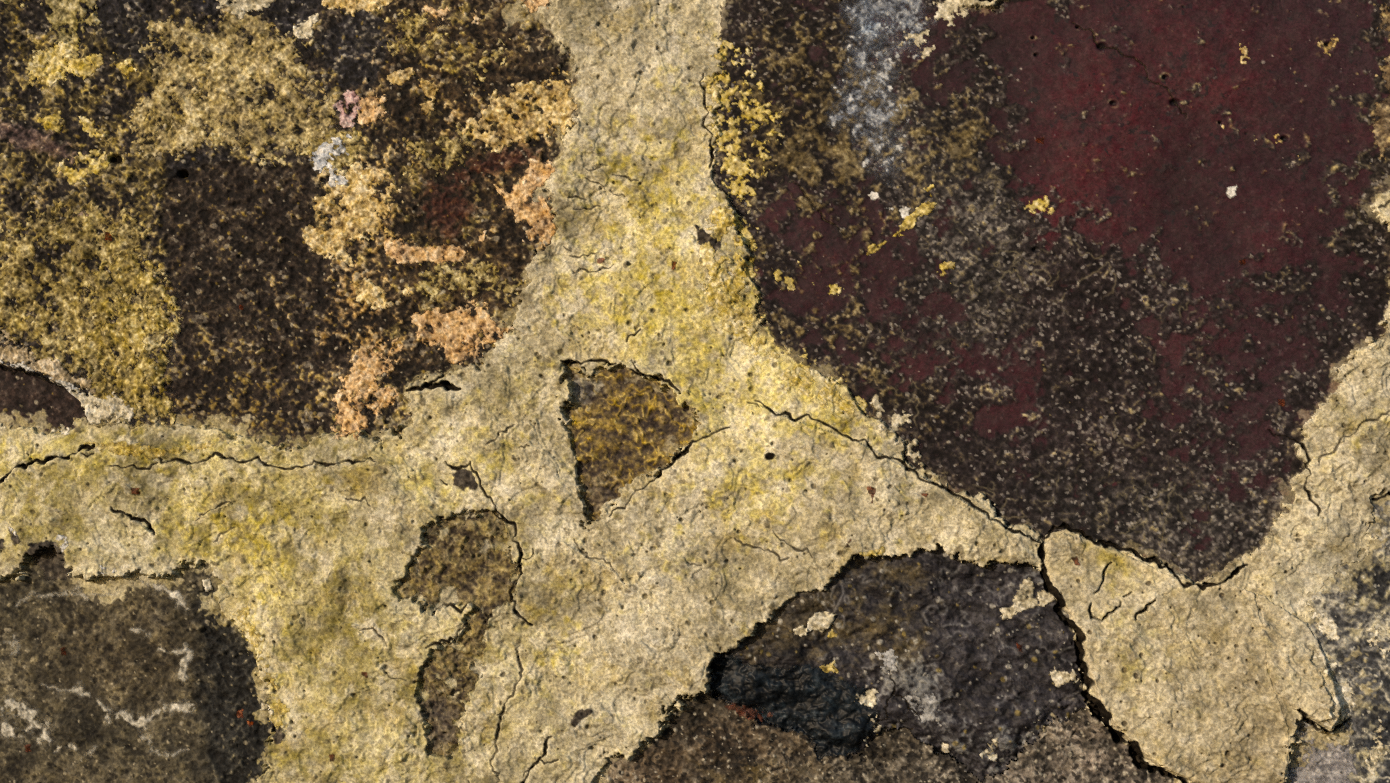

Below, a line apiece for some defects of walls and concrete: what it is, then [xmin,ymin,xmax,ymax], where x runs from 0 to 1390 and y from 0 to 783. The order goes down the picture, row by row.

peeling [300,67,487,310]
peeling [462,70,577,248]
peeling [0,328,96,395]
peeling [330,300,515,440]
crack [0,444,375,483]
spalling [0,529,73,581]
spalling [397,509,520,757]
peeling [793,611,836,637]
crack [609,401,1248,783]
peeling [1000,578,1056,620]
spalling [709,653,880,761]
crack [1297,709,1351,733]